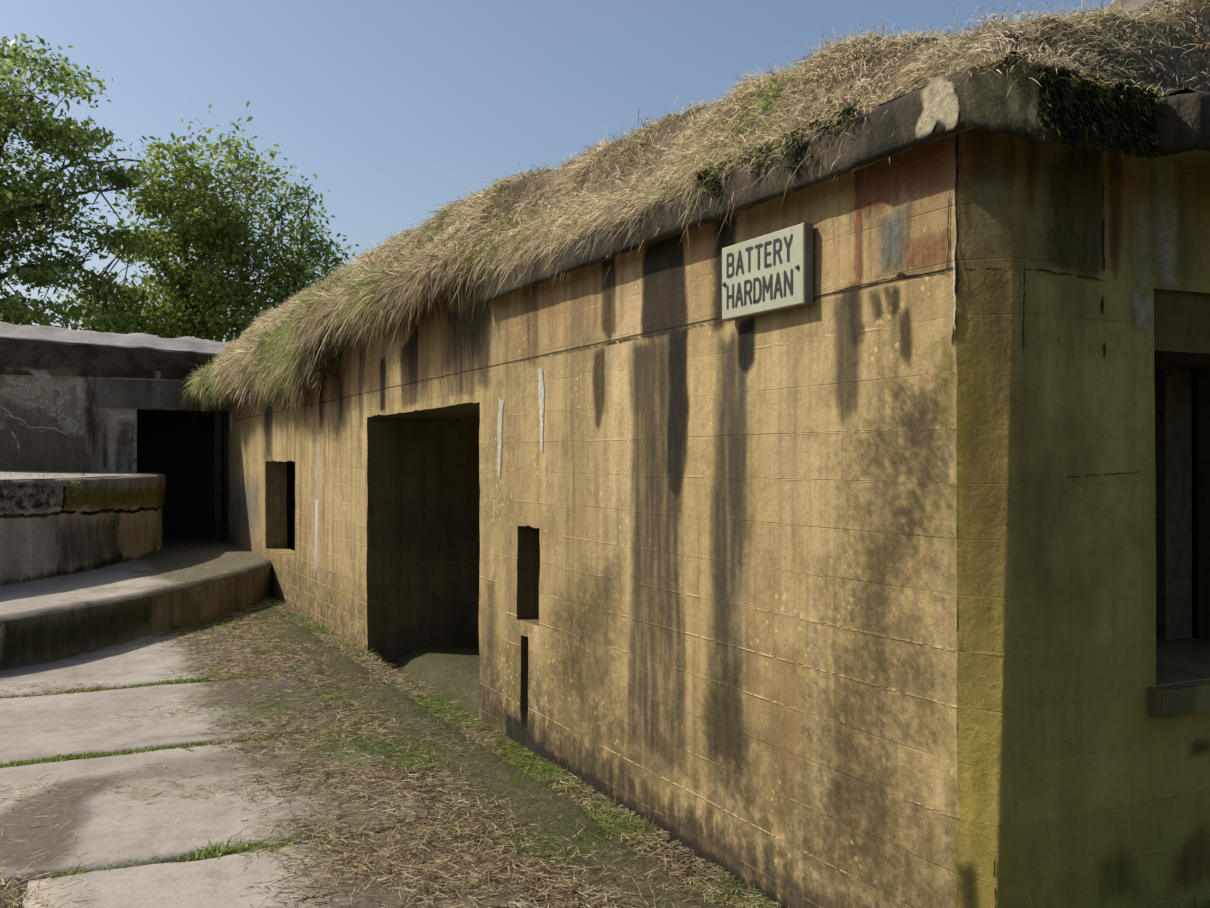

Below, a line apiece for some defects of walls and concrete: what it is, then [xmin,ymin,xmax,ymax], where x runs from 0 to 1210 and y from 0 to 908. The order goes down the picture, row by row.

water stain [593,258,614,427]
water stain [713,214,736,329]
water stain [837,287,909,413]
crack [822,133,1105,353]
peeling [0,392,88,513]
water stain [631,233,688,761]
water stain [702,318,754,784]